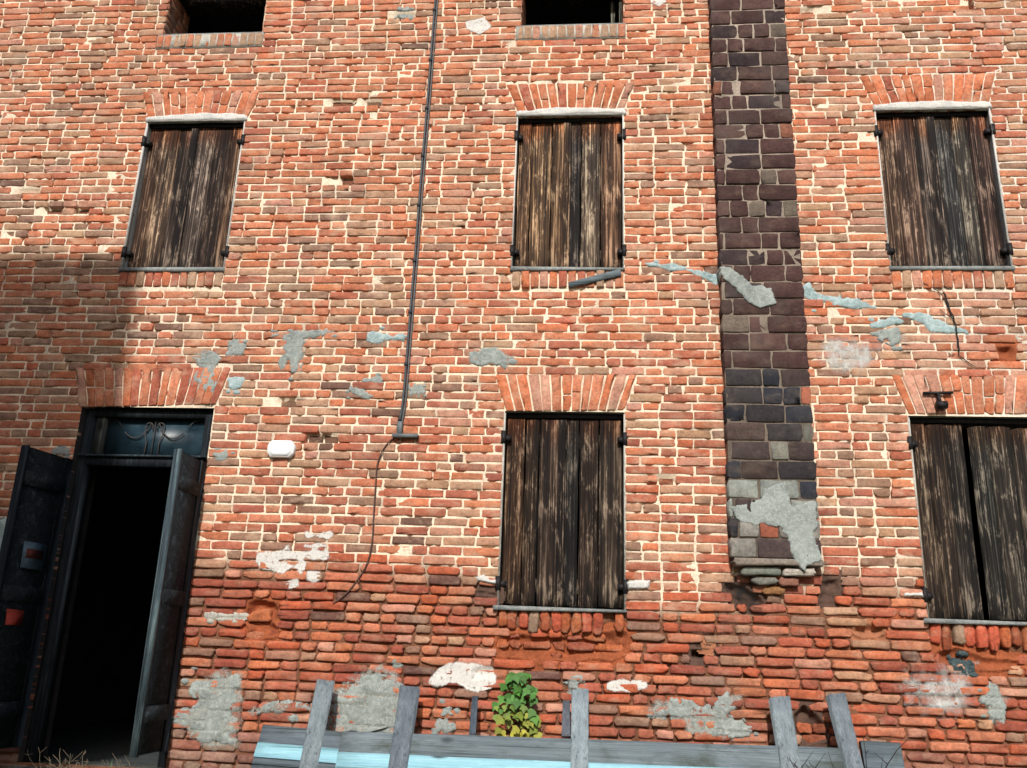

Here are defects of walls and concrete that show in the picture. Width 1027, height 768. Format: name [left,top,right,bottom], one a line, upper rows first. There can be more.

crack [922,279,976,367]